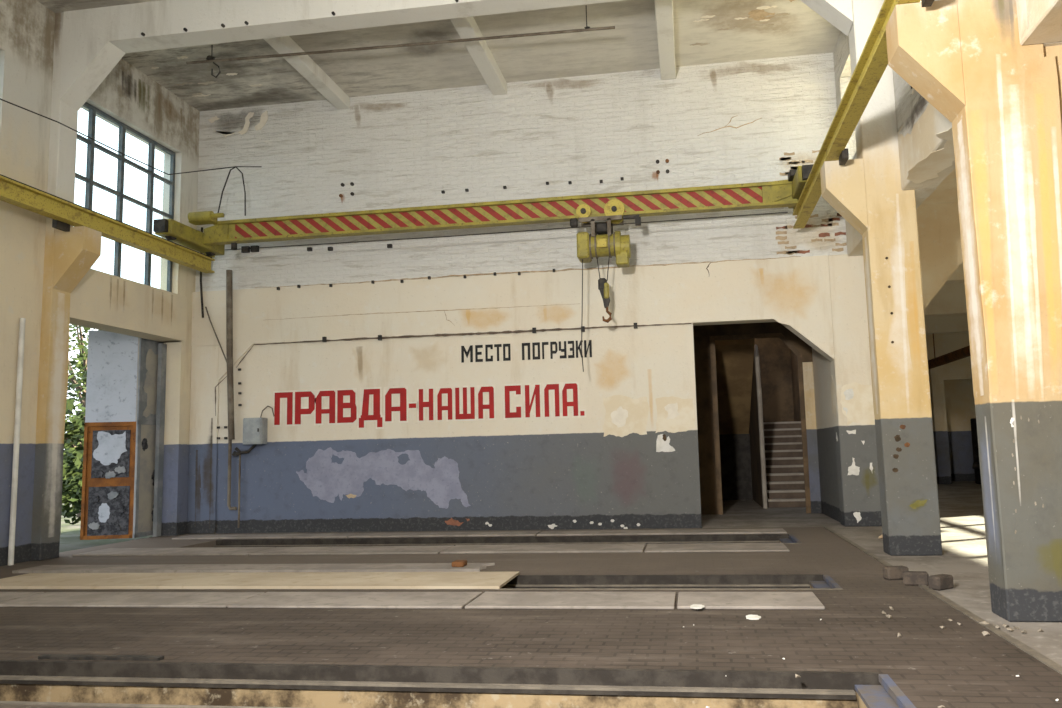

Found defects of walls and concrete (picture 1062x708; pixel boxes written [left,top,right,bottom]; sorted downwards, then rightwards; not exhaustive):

damp [120,40,323,133]
spalling [771,209,847,256]
peeling [603,395,695,452]
peeling [848,458,873,475]
peeling [214,447,803,547]